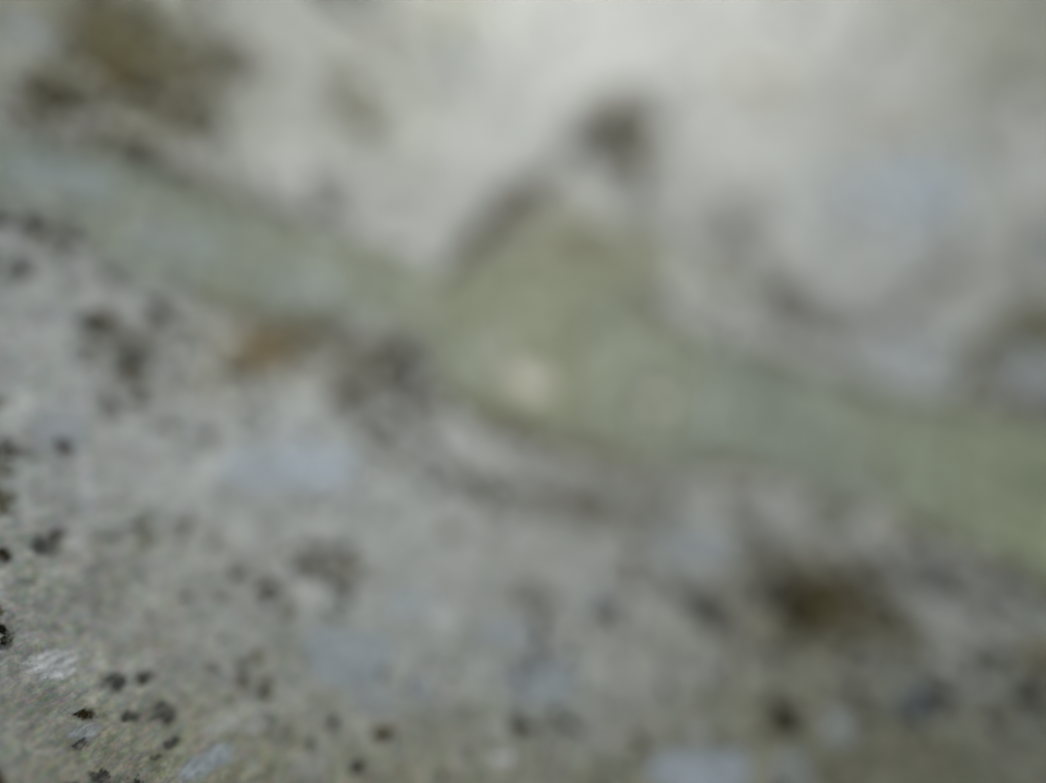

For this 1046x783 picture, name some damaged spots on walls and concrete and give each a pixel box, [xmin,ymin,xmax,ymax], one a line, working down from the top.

water stain [31,529,67,555]
water stain [0,547,12,562]
water stain [0,610,13,645]
water stain [100,673,148,692]
water stain [73,708,96,719]
water stain [121,701,174,723]